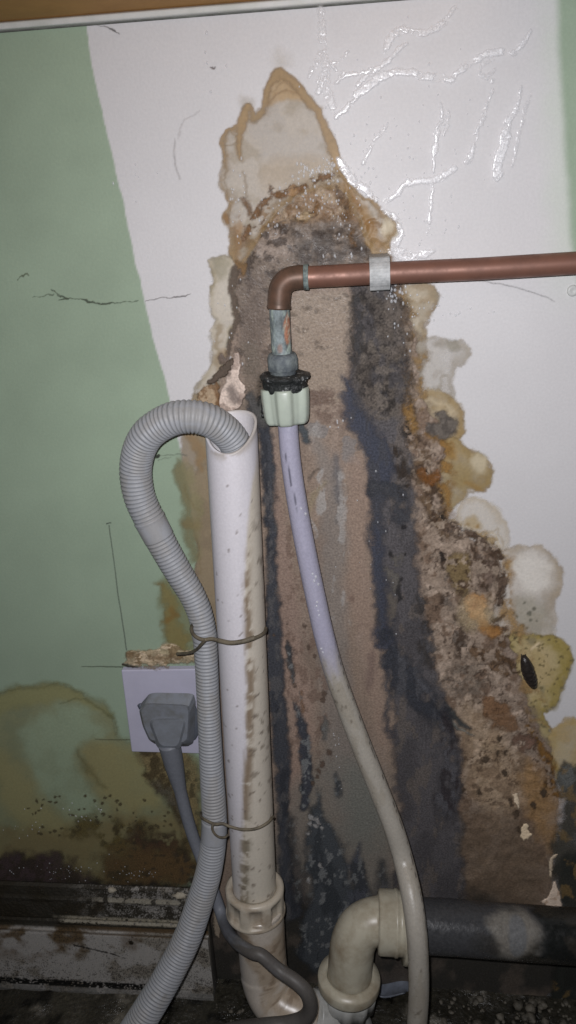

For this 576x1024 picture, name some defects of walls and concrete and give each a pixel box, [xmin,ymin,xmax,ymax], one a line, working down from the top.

crack [57,294,112,305]
peeling [197,184,373,411]
leakage [192,6,532,401]
leakage [0,683,202,888]
leakage [174,433,217,629]
peeling [210,629,241,979]
peeling [258,426,395,983]
peeling [290,286,404,817]
peeling [373,948,409,984]
leakage [341,283,576,907]
peeling [393,284,562,906]
peeling [429,956,559,997]